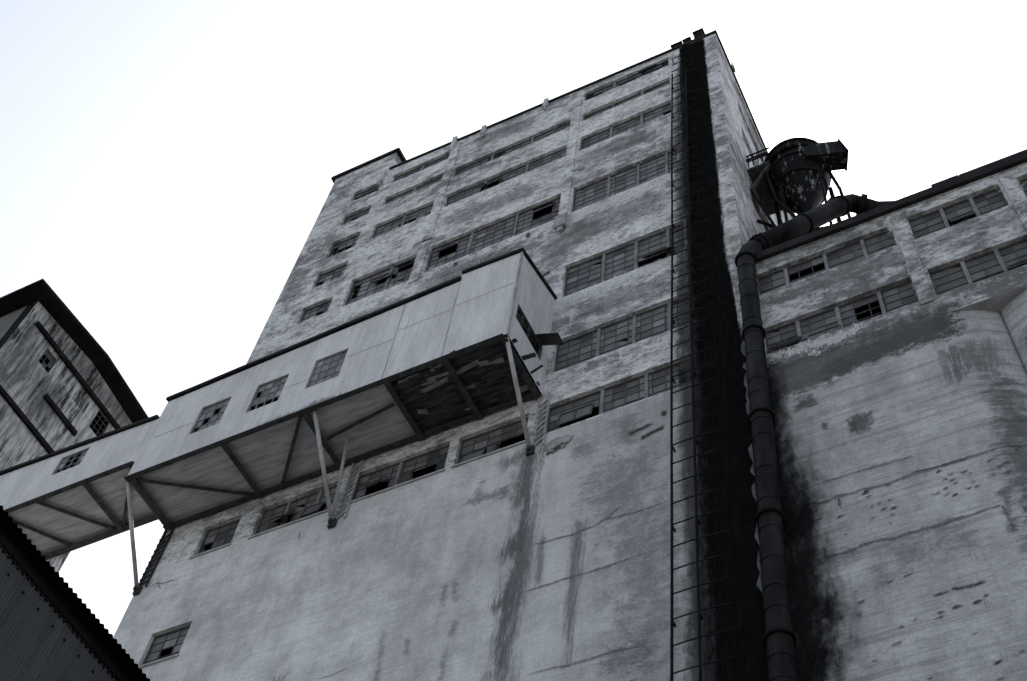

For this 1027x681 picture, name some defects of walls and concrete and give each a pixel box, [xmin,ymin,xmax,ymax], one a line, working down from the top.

damp [772,324,863,358]
damp [941,344,1027,538]
crack [800,445,1027,508]
crack [534,502,664,544]
crack [827,505,1014,558]
damp [494,449,541,681]
crack [528,553,646,591]